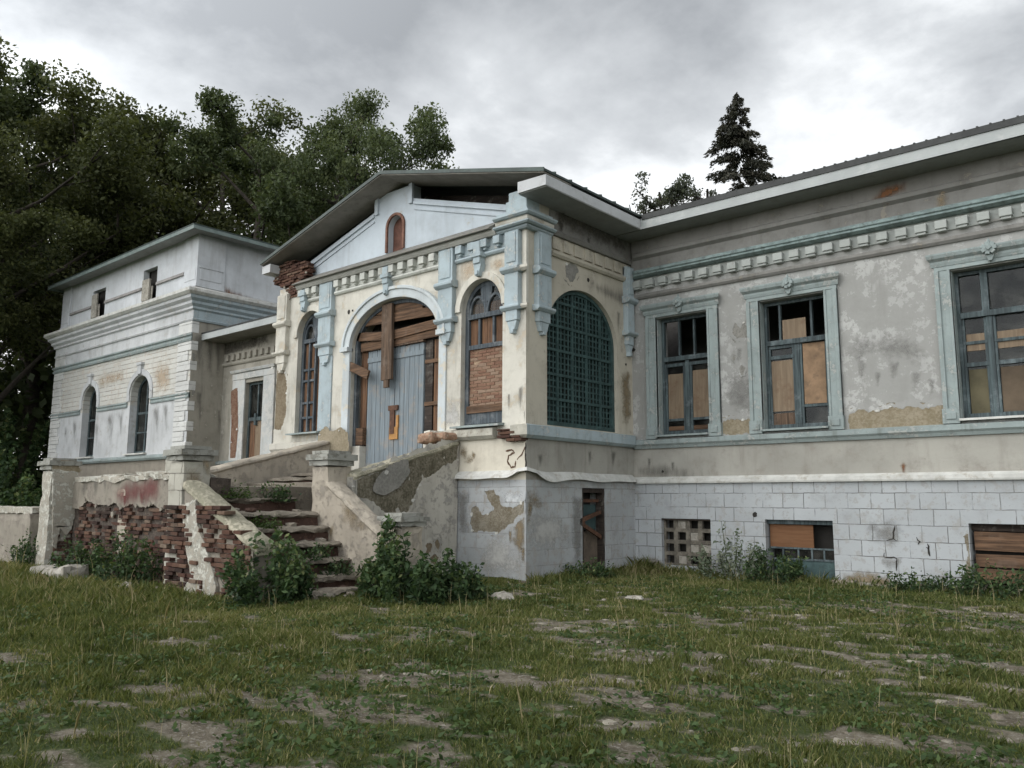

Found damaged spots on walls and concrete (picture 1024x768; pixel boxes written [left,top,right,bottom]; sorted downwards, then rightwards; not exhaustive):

flaking render [273,260,316,300]
flaking render [271,364,290,435]
damp [622,374,631,418]
peeling [844,397,943,429]
flaking render [352,439,459,516]
crack [506,442,527,473]
flaking render [51,460,252,597]
flaking render [466,482,526,539]
crack [883,526,930,571]